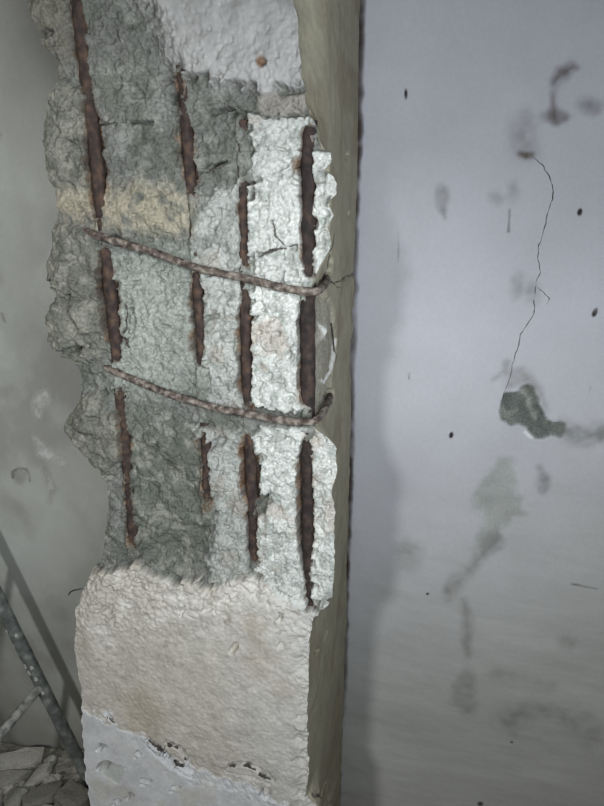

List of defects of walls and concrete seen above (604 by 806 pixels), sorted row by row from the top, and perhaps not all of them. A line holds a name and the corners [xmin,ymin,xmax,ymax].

rust [80,76,111,218]
rust [295,123,324,278]
rust [93,248,124,362]
spalling [28,0,337,806]
rust [187,271,208,369]
rust [235,289,262,410]
rust [296,300,305,405]
crack [501,158,554,404]
rust [238,434,265,564]
rust [294,443,318,613]